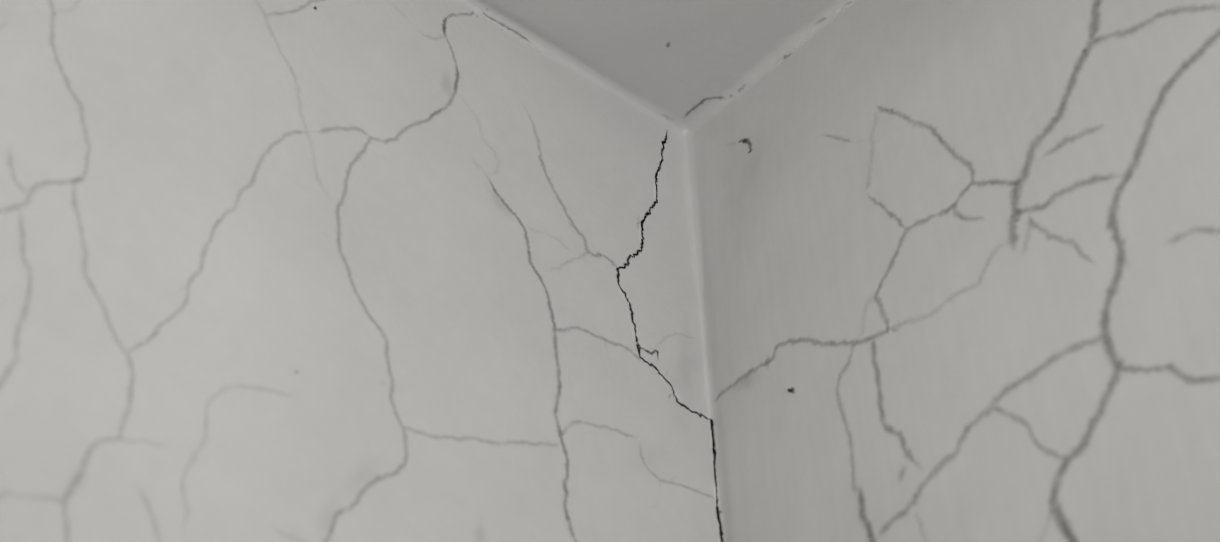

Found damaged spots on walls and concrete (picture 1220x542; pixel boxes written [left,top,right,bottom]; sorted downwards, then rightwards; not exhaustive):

crack [616,132,723,542]